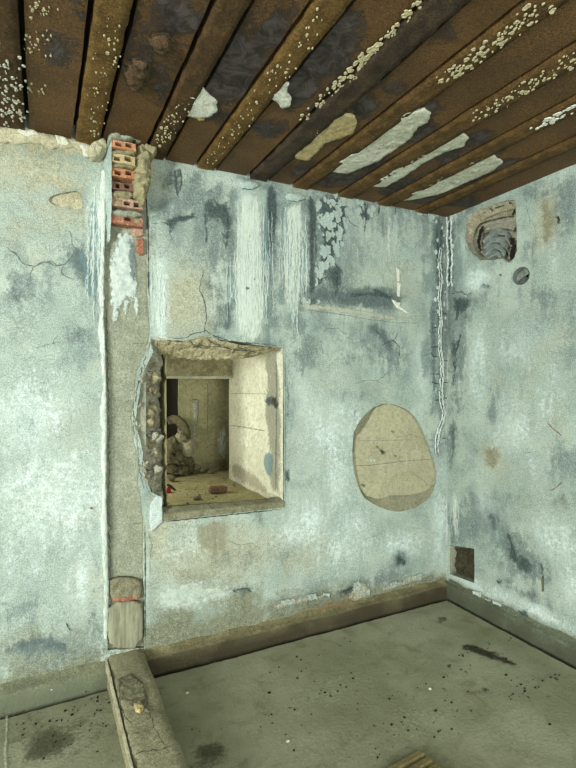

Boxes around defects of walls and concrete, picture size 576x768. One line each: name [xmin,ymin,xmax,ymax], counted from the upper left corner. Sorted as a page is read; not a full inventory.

corrosion [122,56,151,93]
corrosion [146,32,175,55]
damp [174,169,182,196]
crack [8,230,89,279]
crack [172,269,275,346]
damp [166,186,399,343]
peeling [314,193,376,286]
damp [370,323,391,349]
damp [430,220,469,390]
flaking render [98,170,144,639]
spalling [132,336,280,507]
spalling [352,404,436,512]